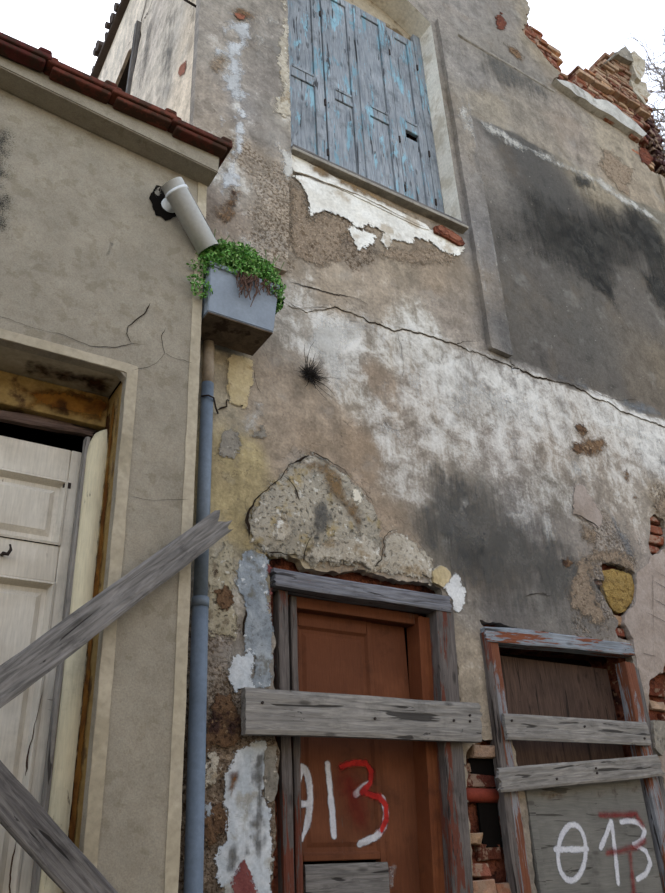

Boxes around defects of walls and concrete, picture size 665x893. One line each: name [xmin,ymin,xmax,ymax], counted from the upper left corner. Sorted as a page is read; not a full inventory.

flaking render [523,25,568,81]
spalling [629,51,651,106]
flaking render [283,151,465,267]
water stain [523,174,665,306]
crack [2,304,191,370]
flaking render [218,354,268,459]
crack [288,282,665,427]
flaking render [562,484,636,638]
flaking render [648,516,664,555]
flaking render [204,541,279,893]
flaking render [464,744,496,789]
flaking render [470,803,511,893]